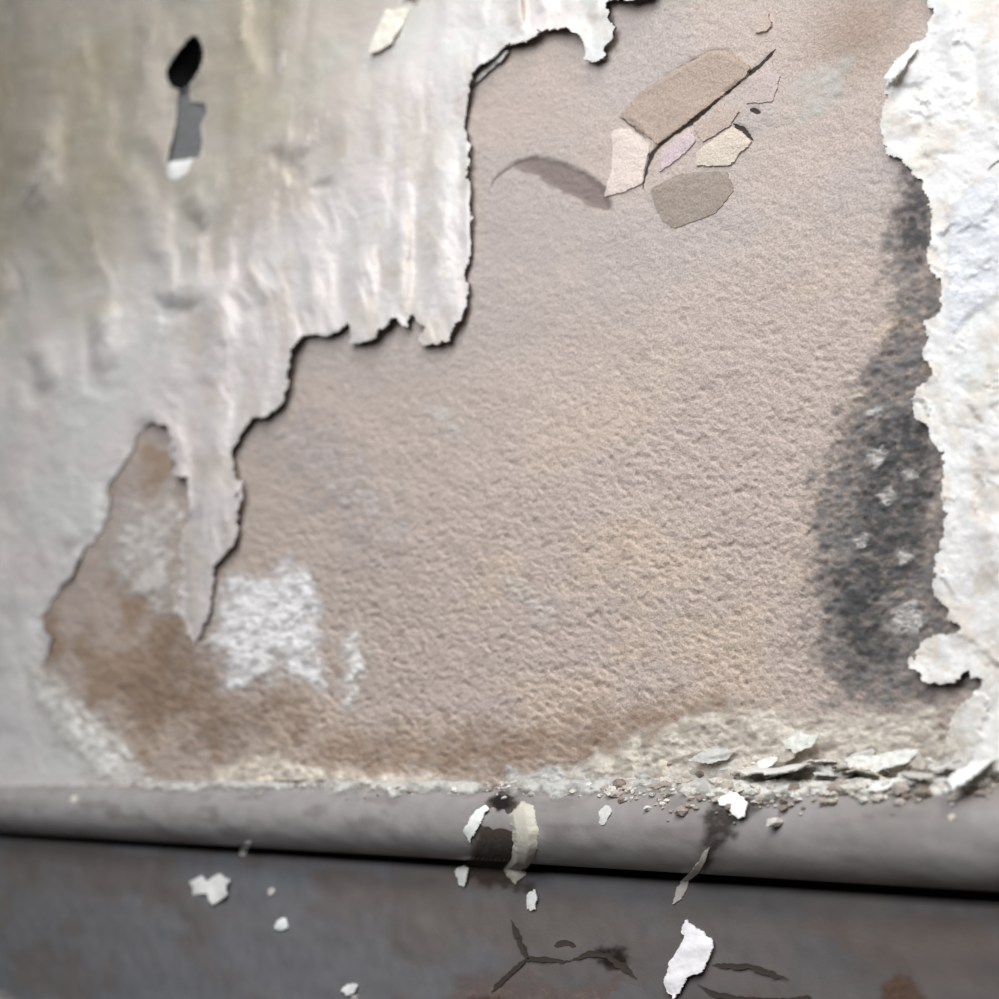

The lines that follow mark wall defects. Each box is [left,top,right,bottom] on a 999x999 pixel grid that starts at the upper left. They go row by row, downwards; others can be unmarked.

flaking render [38,0,999,791]
damp [500,182,971,799]
damp [109,499,185,615]
damp [204,560,327,691]
damp [341,631,365,708]
peeling [190,874,230,905]
spalling [454,791,540,911]
peeling [599,805,612,825]